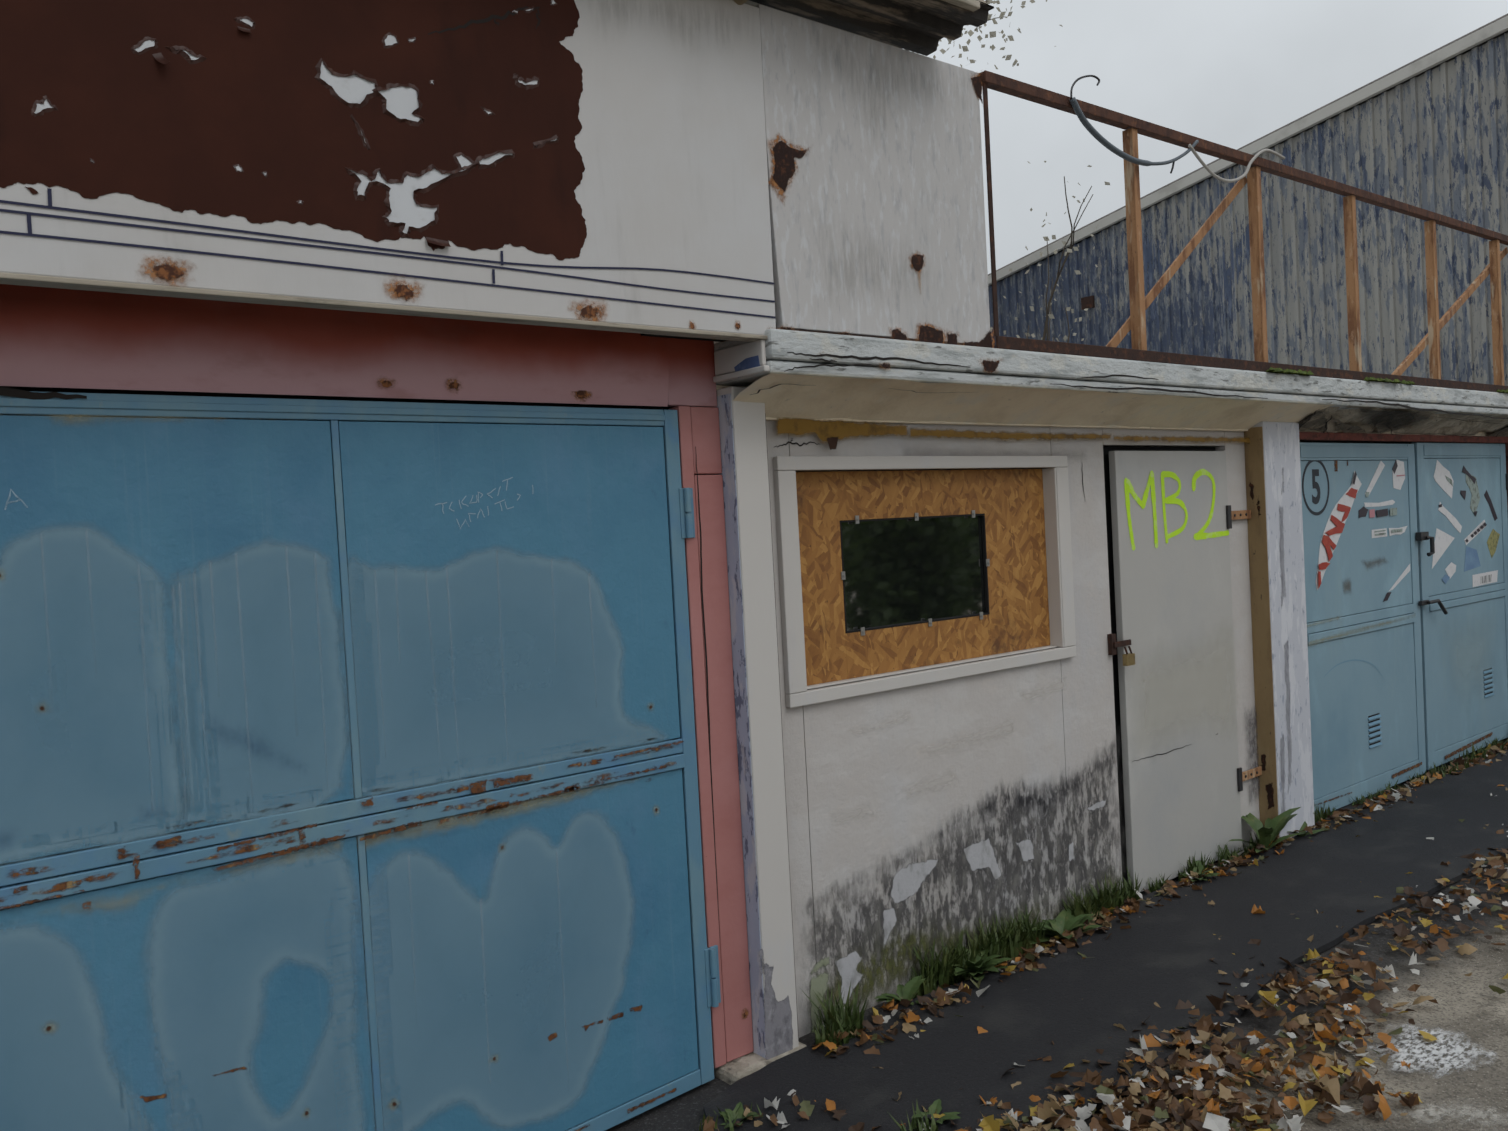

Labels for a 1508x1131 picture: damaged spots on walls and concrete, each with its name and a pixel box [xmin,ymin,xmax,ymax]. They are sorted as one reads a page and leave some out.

peeling [131,36,207,64]
peeling [382,32,416,48]
peeling [31,95,59,117]
peeling [314,58,434,150]
peeling [344,149,515,247]
corrosion [144,258,187,284]
corrosion [386,281,421,301]
corrosion [0,738,684,909]
spalling [964,838,1001,880]
spalling [1016,839,1034,861]
spalling [883,859,938,944]
water stain [813,757,1117,1017]